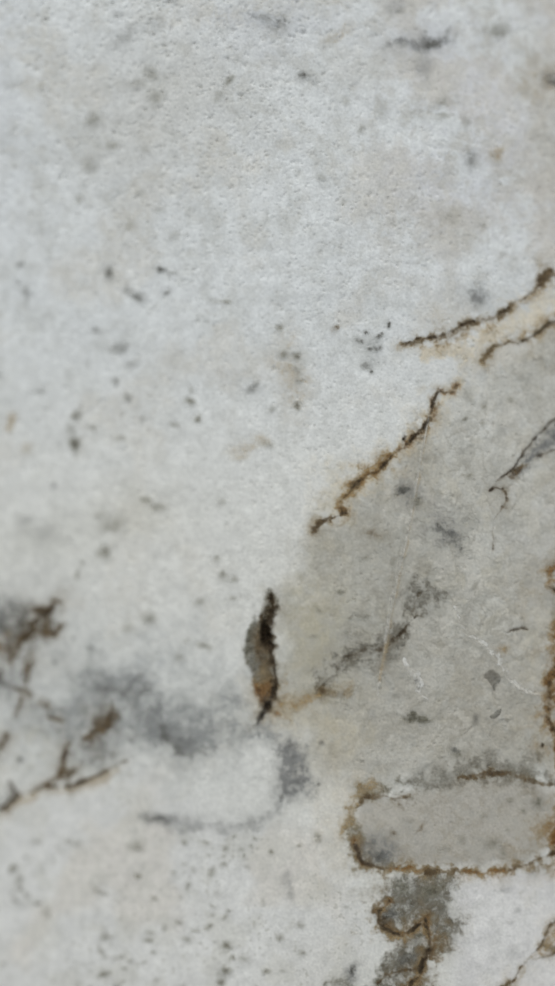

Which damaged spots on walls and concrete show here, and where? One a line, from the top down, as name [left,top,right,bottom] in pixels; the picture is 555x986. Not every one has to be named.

crack [401,268,555,365]
crack [311,384,459,533]
crack [489,420,555,508]
damp [0,598,320,802]
spalling [245,589,280,727]
crack [315,576,447,696]
rust [540,620,555,751]
crack [0,732,127,810]
rust [348,807,555,986]
crack [501,922,555,986]